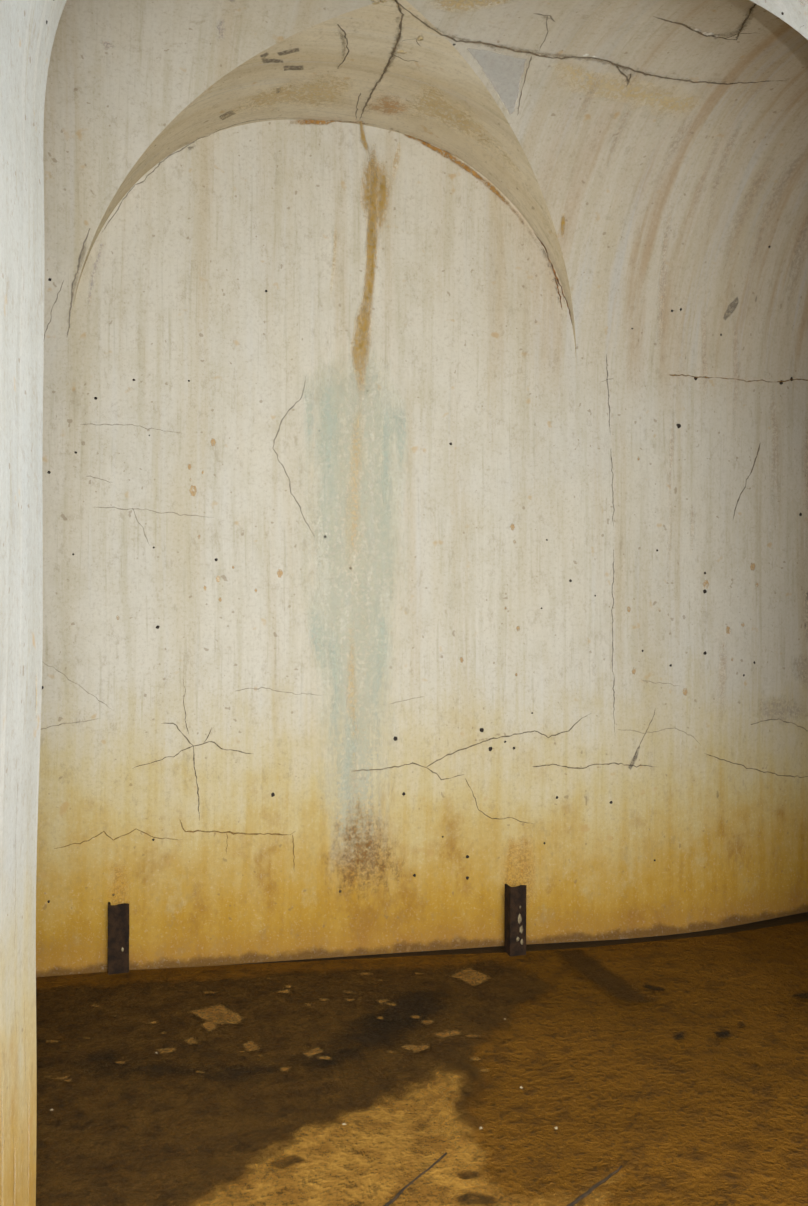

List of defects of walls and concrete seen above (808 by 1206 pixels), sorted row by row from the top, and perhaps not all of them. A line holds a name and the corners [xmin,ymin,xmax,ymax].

crack [338,25,349,67]
crack [356,0,783,118]
rust [405,134,523,222]
rust [298,120,398,382]
crack [602,355,610,426]
crack [671,374,808,382]
water stain [308,369,404,888]
crack [355,457,655,823]
crack [54,680,295,865]
crack [707,754,808,778]